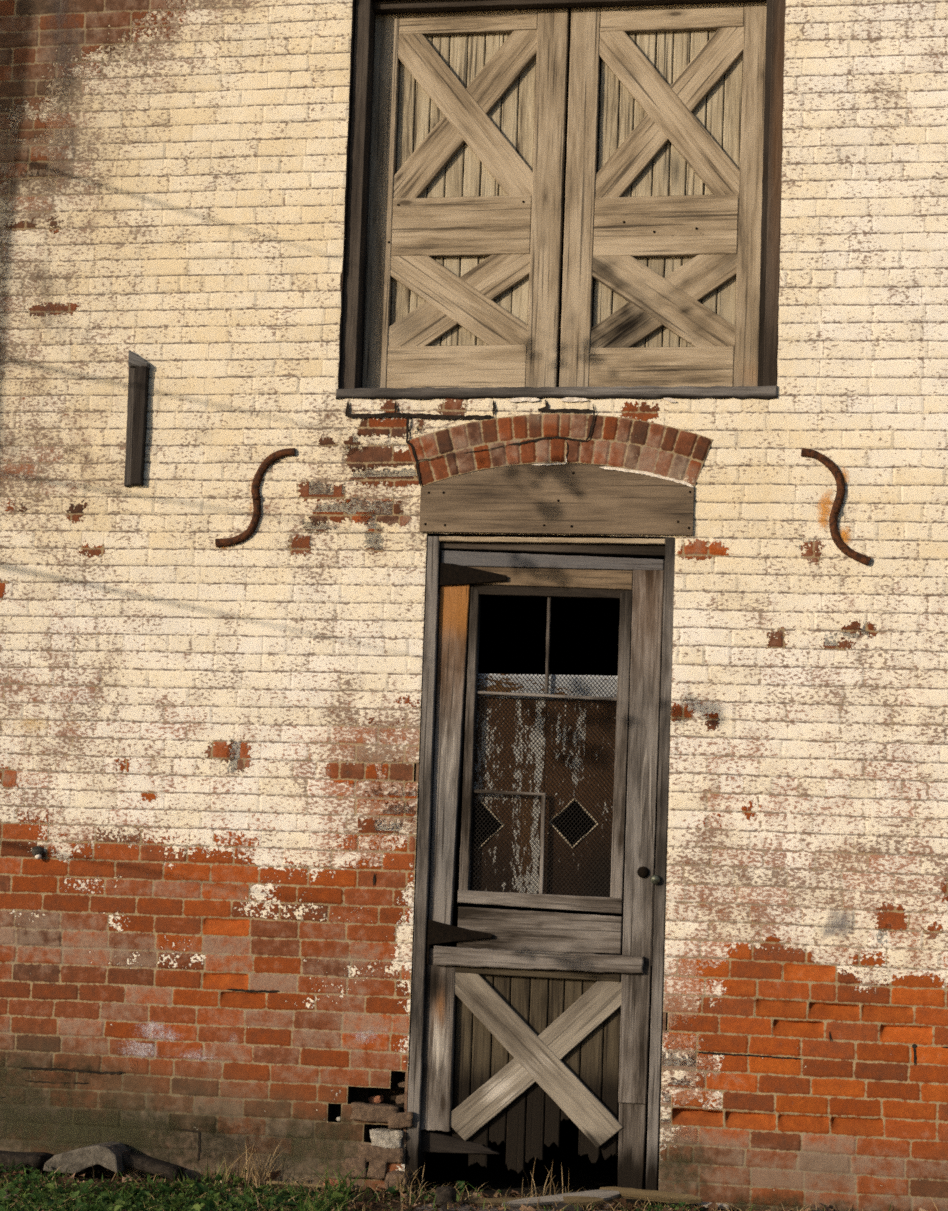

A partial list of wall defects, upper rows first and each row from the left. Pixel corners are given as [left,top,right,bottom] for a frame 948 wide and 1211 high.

peeling [0,0,205,184]
peeling [1,213,64,234]
peeling [23,302,79,319]
peeling [620,401,665,422]
peeling [287,399,426,557]
peeling [65,500,88,523]
rust [818,494,831,527]
peeling [79,540,108,558]
peeling [676,538,729,561]
peeling [205,737,253,776]
peeling [0,758,418,1191]
peeling [658,900,948,1211]